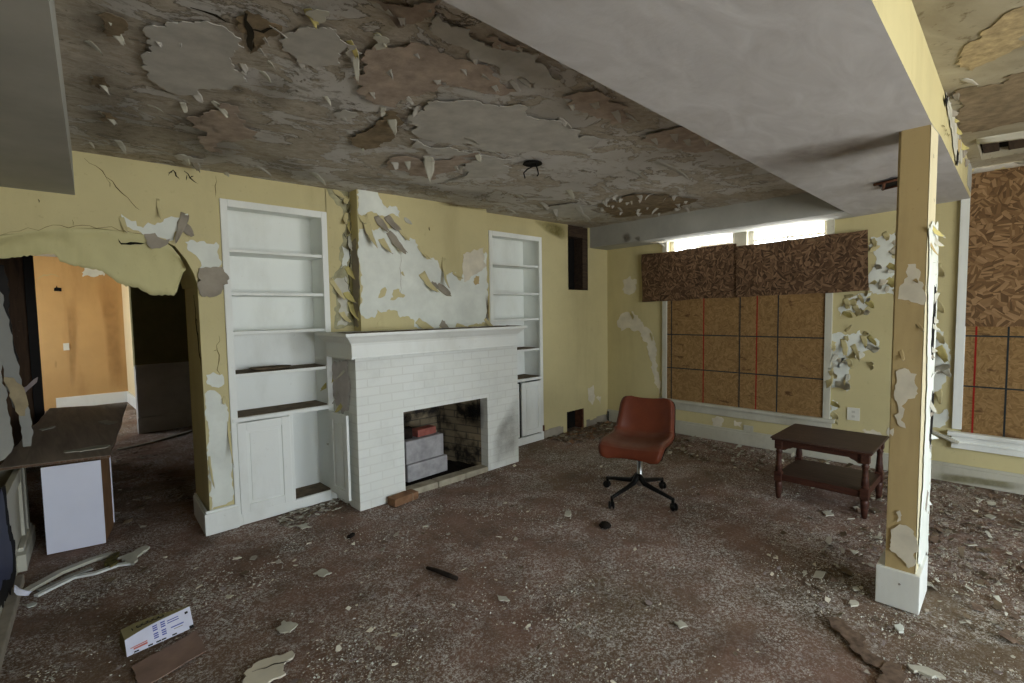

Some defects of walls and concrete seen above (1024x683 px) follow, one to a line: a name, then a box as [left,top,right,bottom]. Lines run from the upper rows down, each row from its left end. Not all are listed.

crack [190,7,277,52]
peeling [141,0,600,184]
peeling [642,126,723,153]
peeling [945,7,1024,174]
crack [2,158,140,235]
peeling [82,268,105,277]
peeling [119,198,229,297]
peeling [309,172,493,330]
peeling [515,186,698,224]
peeling [205,372,234,509]
peeling [617,311,661,394]
peeling [826,221,952,568]